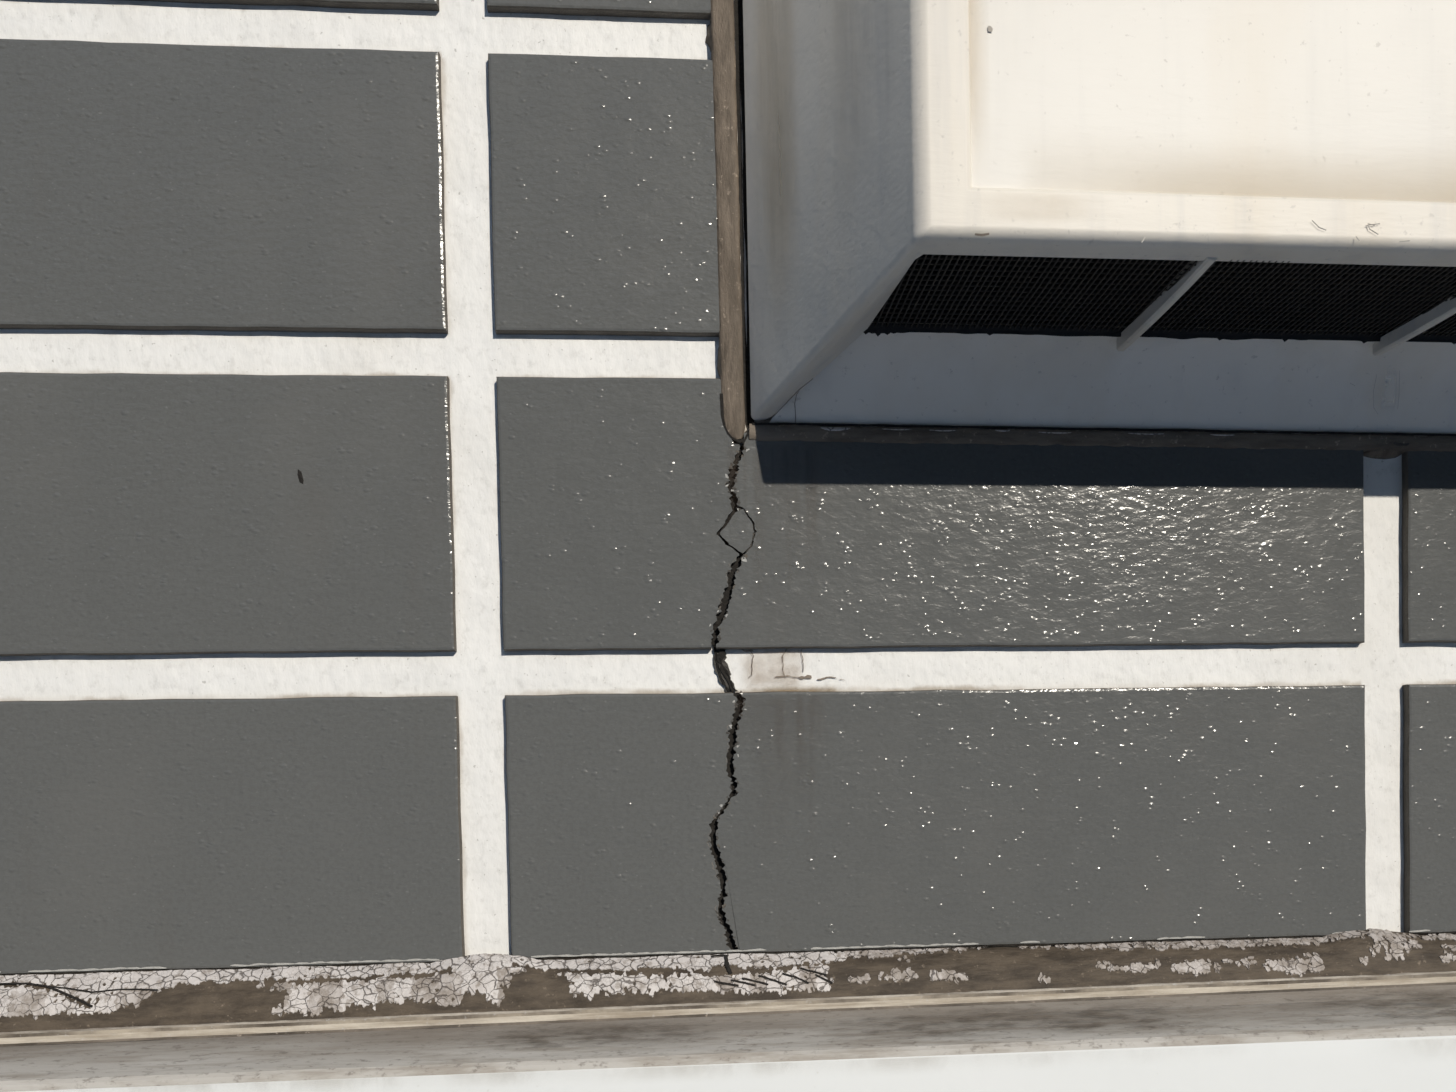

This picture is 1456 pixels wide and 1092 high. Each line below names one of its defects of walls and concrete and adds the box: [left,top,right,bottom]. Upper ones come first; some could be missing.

crack [707,445,843,987]
peeling [0,947,987,1020]
peeling [1018,928,1456,977]